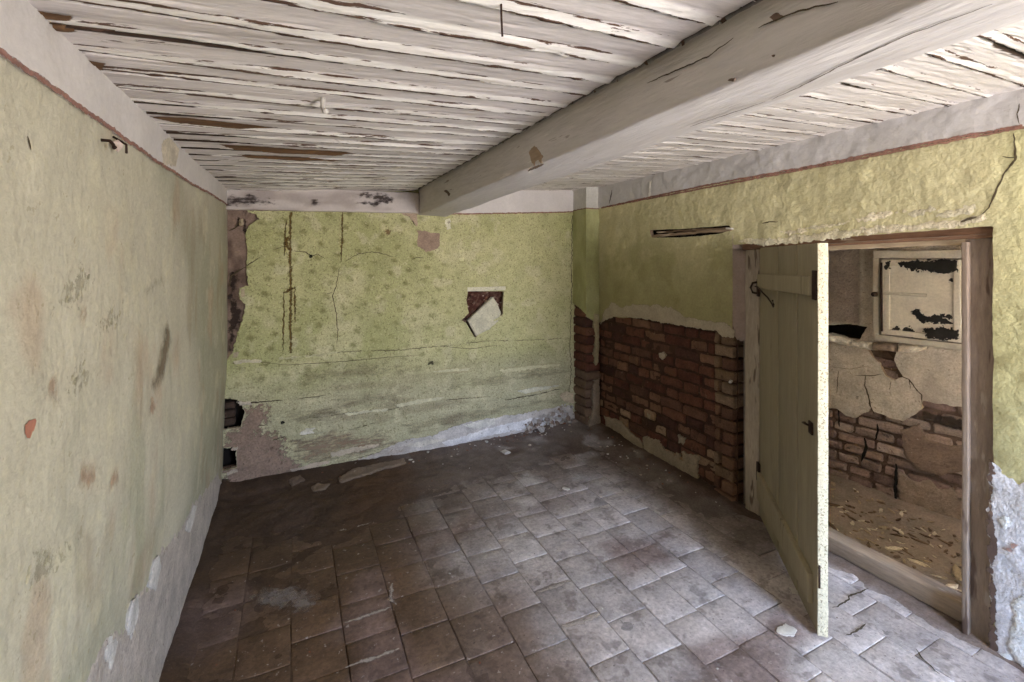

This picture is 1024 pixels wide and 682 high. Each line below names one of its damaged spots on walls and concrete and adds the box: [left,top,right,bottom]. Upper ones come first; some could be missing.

peeling [153,117,277,129]
peeling [220,144,354,162]
crack [982,104,1020,214]
spalling [227,210,262,364]
spalling [462,286,506,336]
peeling [884,258,959,282]
peeling [891,309,959,342]
spalling [224,398,252,428]
spalling [290,302,744,502]
crack [834,366,922,413]
peeling [86,446,244,682]
peeling [986,459,1024,668]